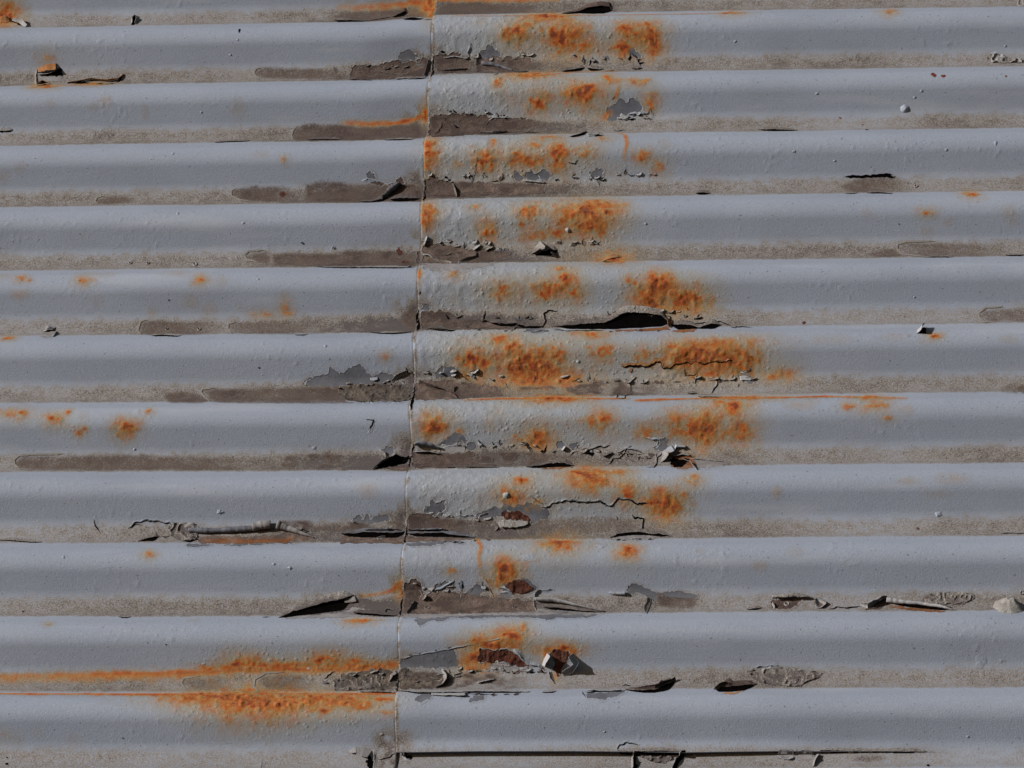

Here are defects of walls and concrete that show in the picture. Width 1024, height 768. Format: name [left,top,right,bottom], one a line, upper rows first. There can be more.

rust [519,200,626,239]
rust [626,271,712,313]
peeling [369,301,753,334]
rust [456,331,899,448]
crack [614,358,752,399]
peeling [373,430,730,472]
crack [532,495,646,509]
peeling [263,576,606,626]
peeling [747,593,953,612]
rust [2,655,398,679]
peeling [321,638,578,704]
rust [0,688,396,722]